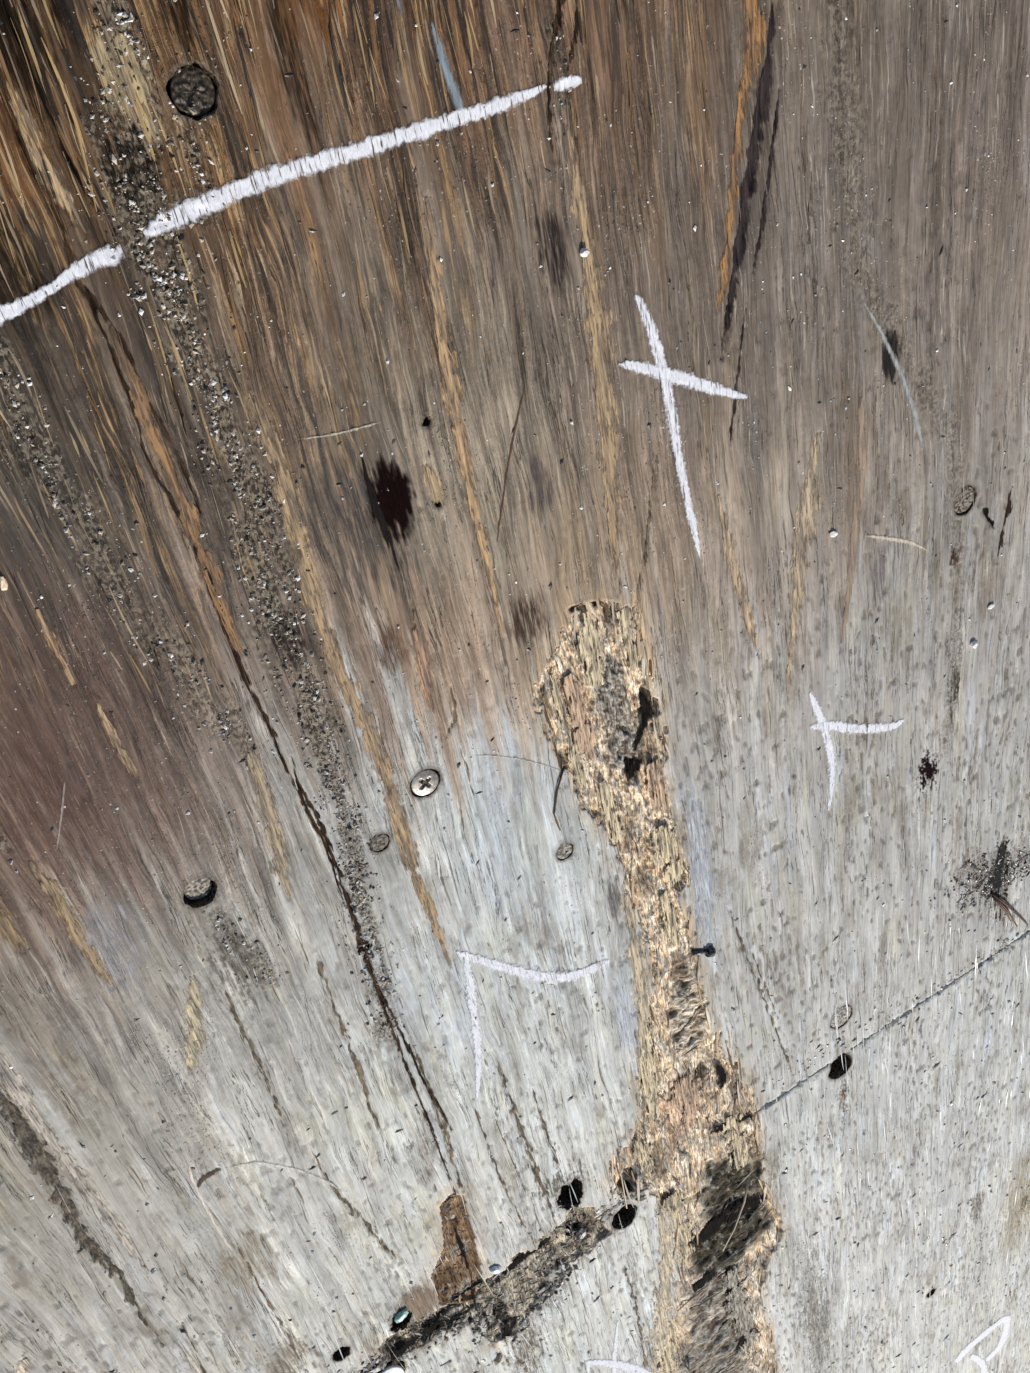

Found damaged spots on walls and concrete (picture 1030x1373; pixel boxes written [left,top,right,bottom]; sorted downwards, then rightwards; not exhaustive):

water stain [361,453,400,571]
peeling [416,198,504,637]
crack [720,5,780,442]
spalling [532,126,783,1373]
spalling [379,1193,611,1364]